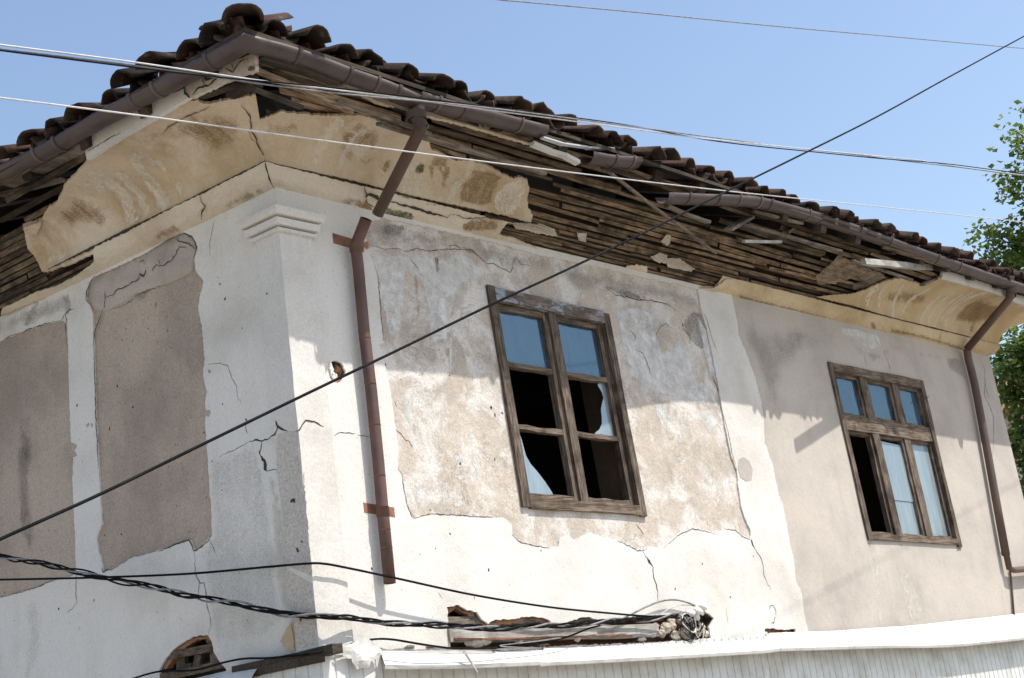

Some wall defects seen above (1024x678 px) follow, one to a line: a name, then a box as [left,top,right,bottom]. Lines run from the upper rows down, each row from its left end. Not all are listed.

leakage [57,151,182,229]
leakage [152,111,239,155]
crack [163,59,246,133]
crack [48,105,547,273]
leakage [313,116,381,171]
leakage [399,156,525,231]
peeling [0,321,78,597]
peeling [86,233,318,678]
crack [208,363,370,471]
peeling [365,218,753,552]
crack [609,290,702,376]
leakage [816,256,997,379]